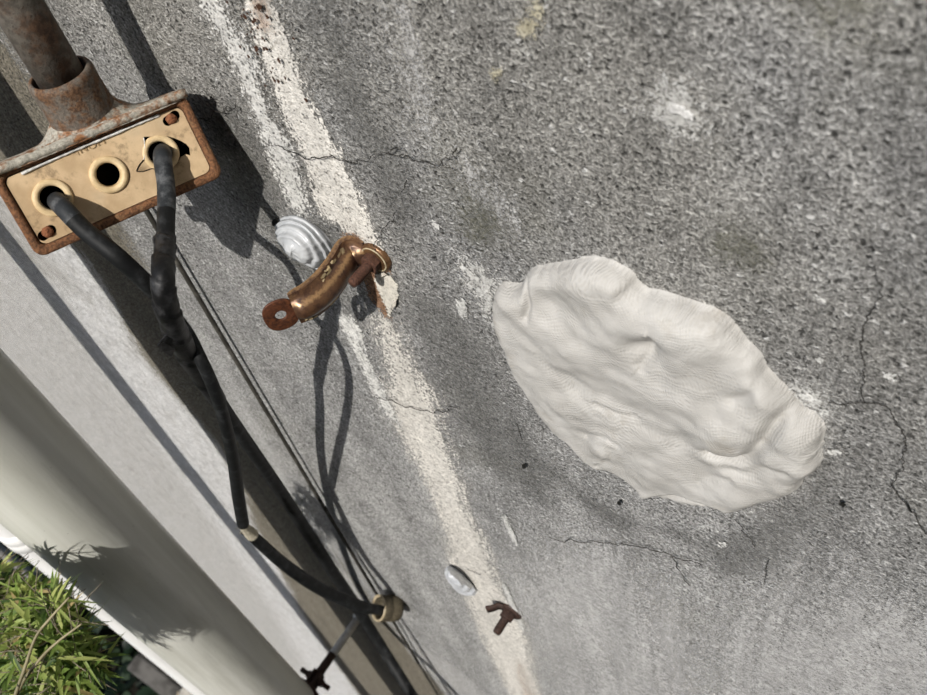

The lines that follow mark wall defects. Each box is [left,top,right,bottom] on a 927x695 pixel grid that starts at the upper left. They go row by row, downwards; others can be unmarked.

crack [274,144,457,250]
rust [362,270,392,318]
crack [828,264,927,535]
crack [549,537,701,586]
crack [735,520,769,585]